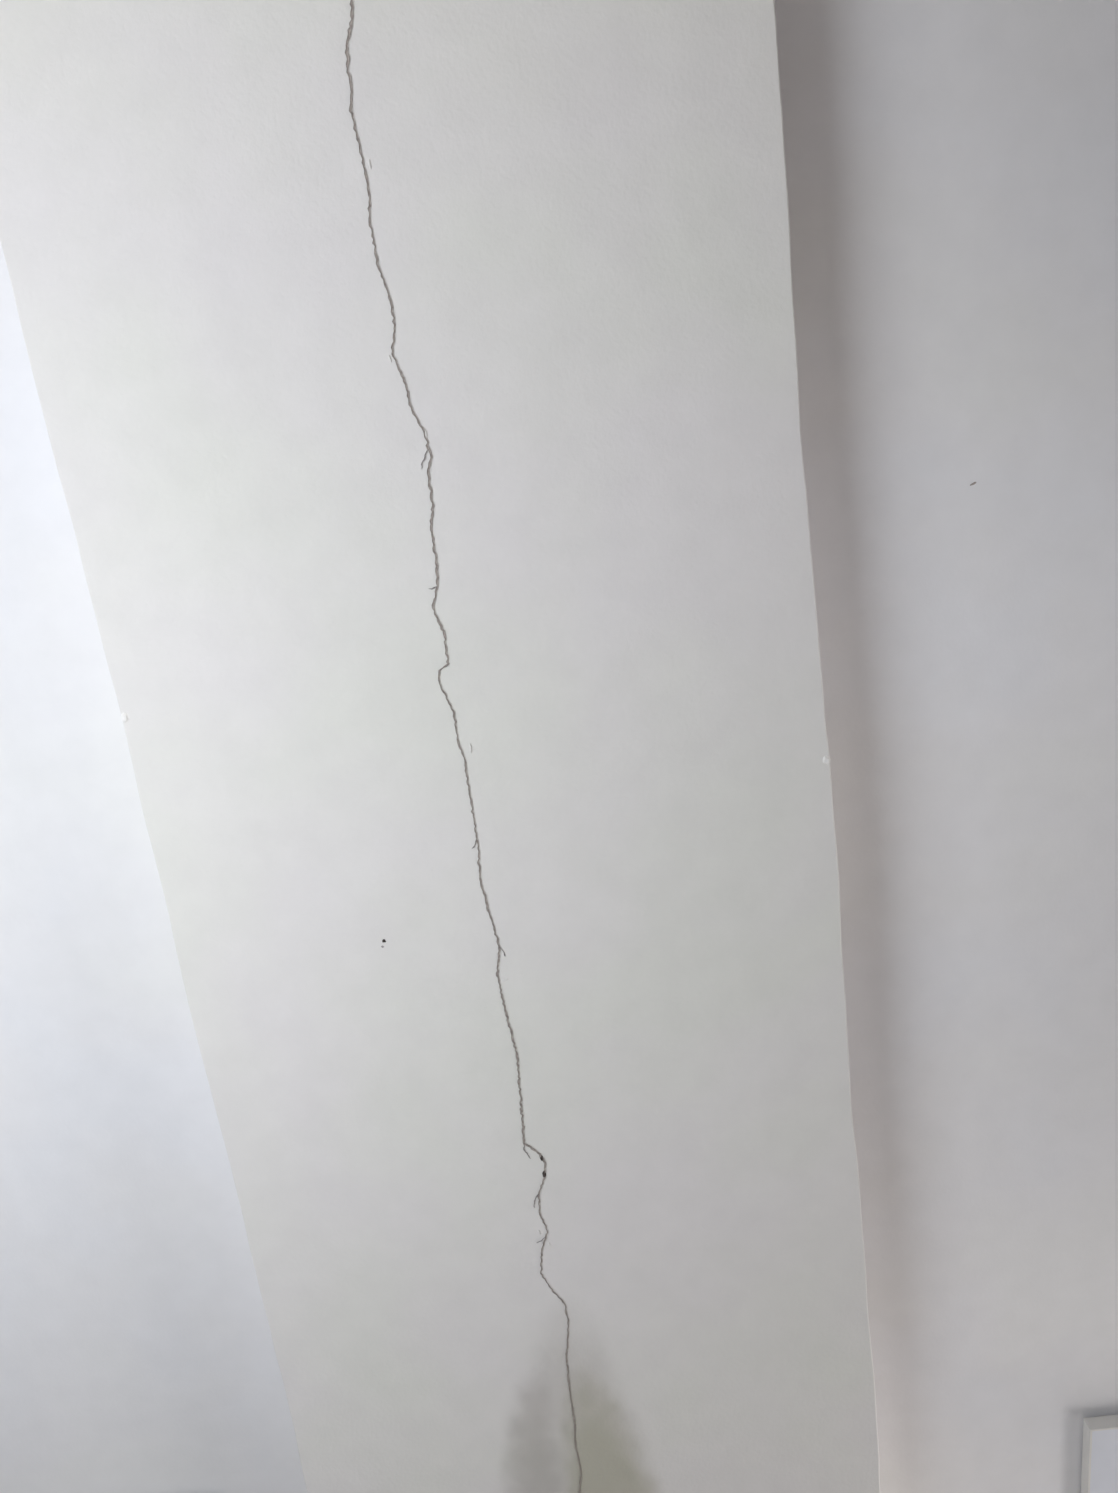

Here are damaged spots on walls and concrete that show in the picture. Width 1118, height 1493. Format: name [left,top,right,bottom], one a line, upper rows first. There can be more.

crack [345,0,582,1493]